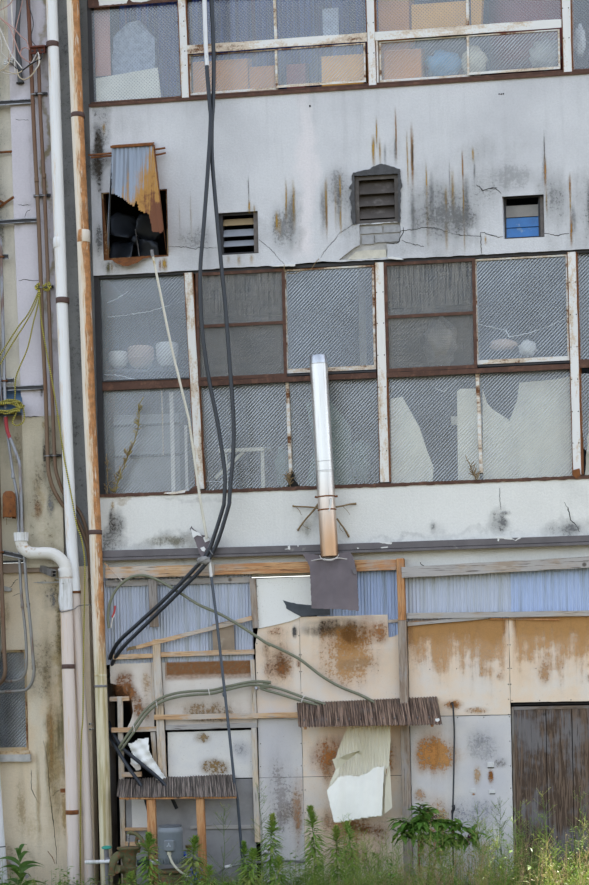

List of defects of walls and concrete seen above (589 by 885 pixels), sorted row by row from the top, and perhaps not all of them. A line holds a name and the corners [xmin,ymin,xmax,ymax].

rust [395,117,413,177]
spalling [340,222,404,260]
crack [389,227,503,254]